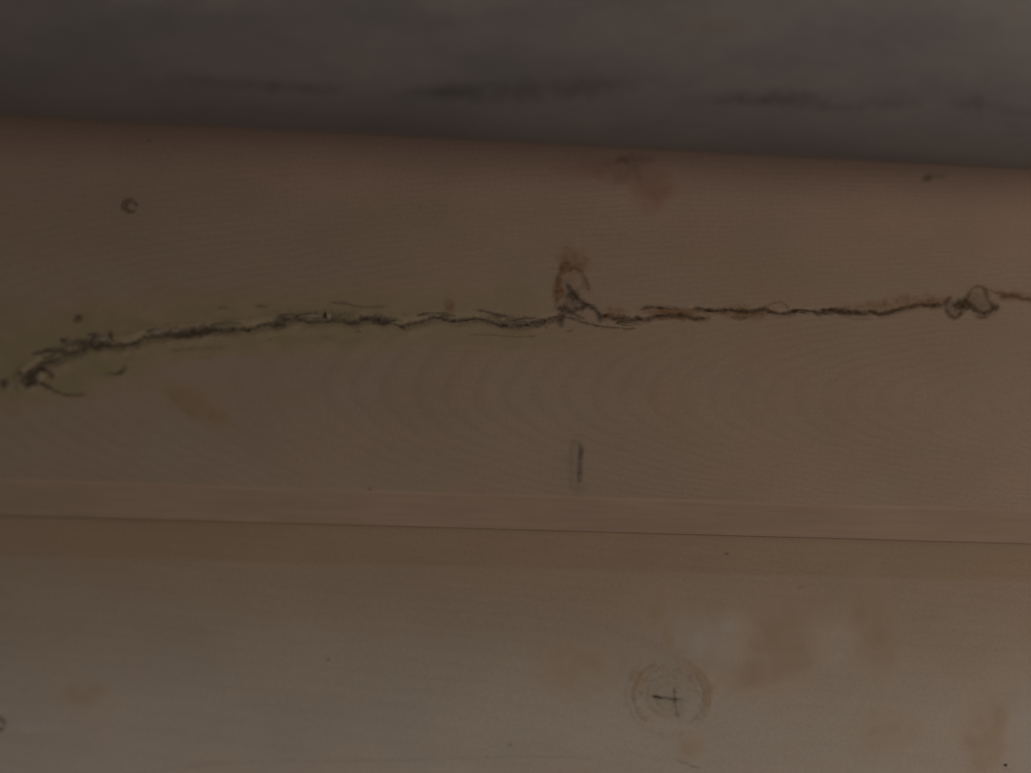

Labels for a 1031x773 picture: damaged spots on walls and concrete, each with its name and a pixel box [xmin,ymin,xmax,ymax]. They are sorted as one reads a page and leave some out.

crack [3,302,560,396]
crack [602,303,943,330]